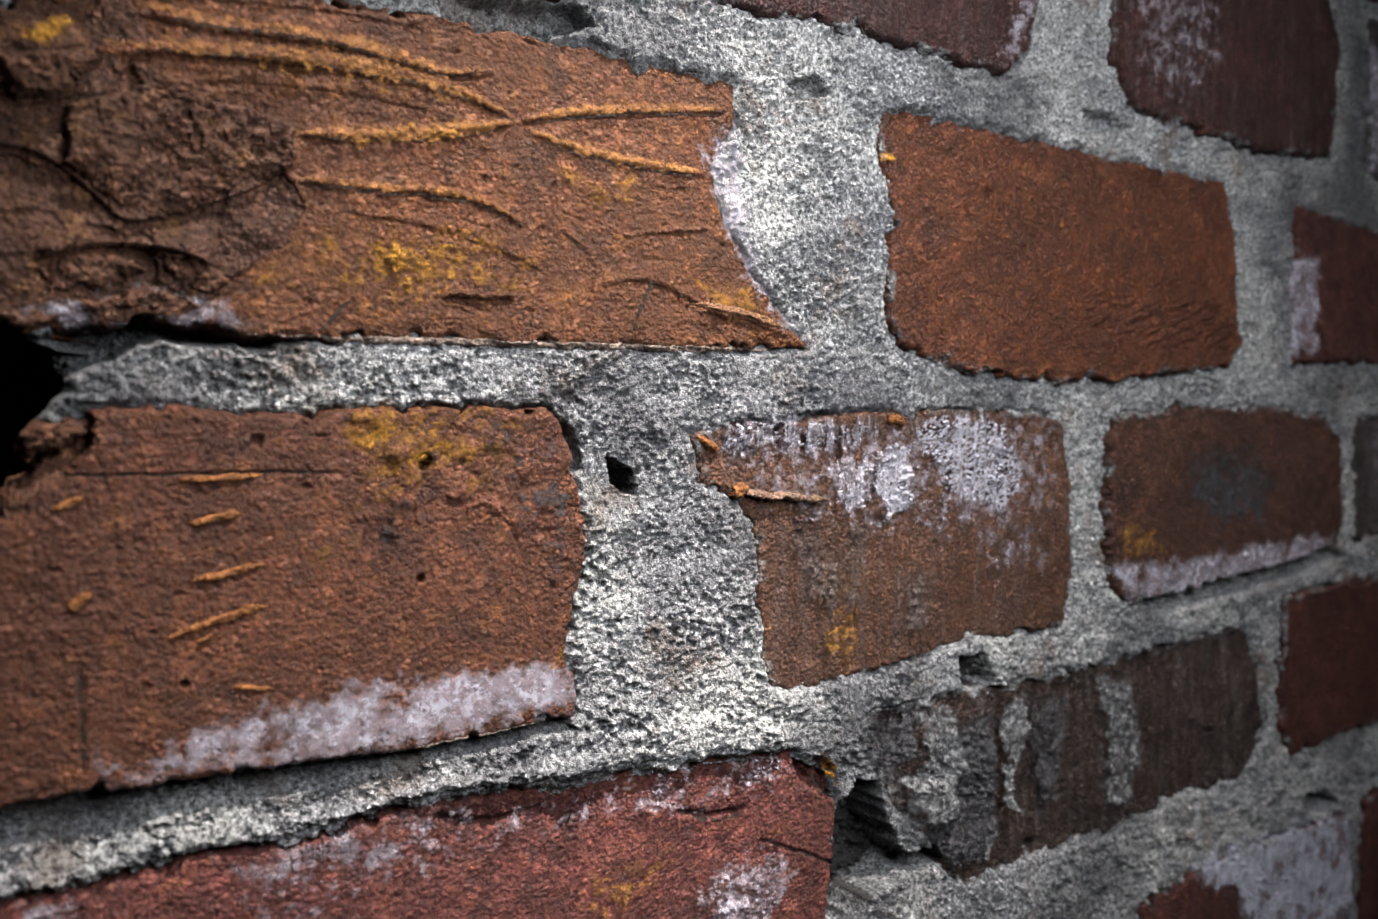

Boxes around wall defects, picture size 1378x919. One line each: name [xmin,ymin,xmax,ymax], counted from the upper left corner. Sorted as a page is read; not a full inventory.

crack [144,10,718,177]
spalling [0,0,305,352]
crack [309,185,511,222]
crack [319,296,354,332]
crack [633,276,683,331]
damp [724,411,1045,609]
damp [898,575,927,628]
damp [141,663,576,781]